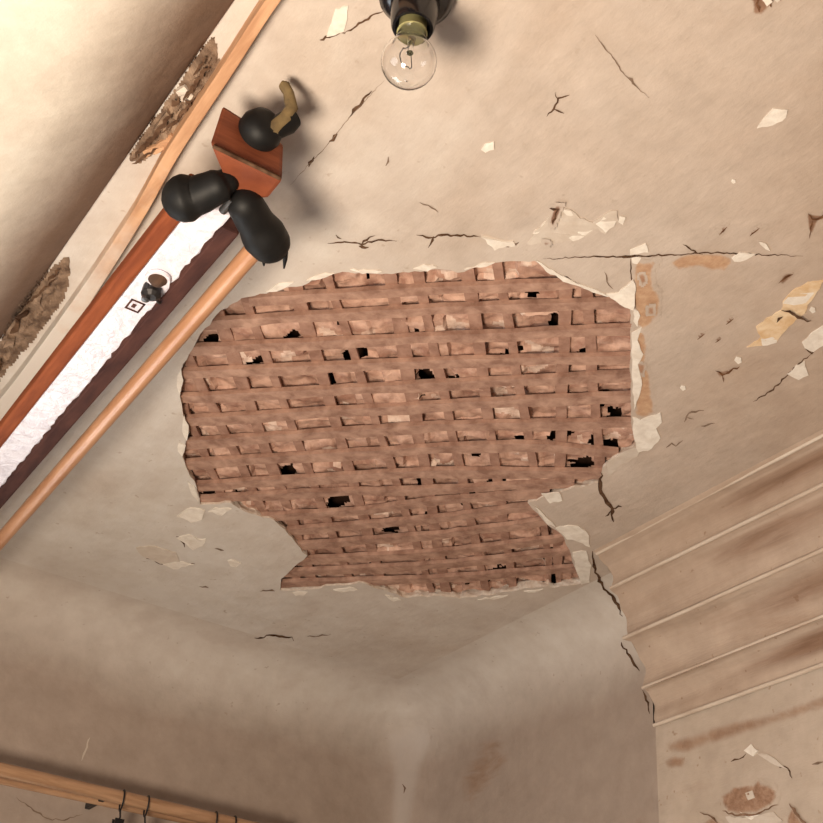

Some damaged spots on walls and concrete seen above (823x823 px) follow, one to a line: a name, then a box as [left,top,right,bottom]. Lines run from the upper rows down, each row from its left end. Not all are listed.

spalling [129,37,220,164]
crack [295,82,383,180]
crack [328,235,393,249]
crack [418,234,519,250]
crack [547,245,794,289]
spalling [0,257,70,378]
peeling [747,270,823,347]
peeling [536,260,662,477]
crack [598,473,622,522]
peeling [535,506,591,585]
crack [592,551,622,616]
spalling [699,778,807,823]